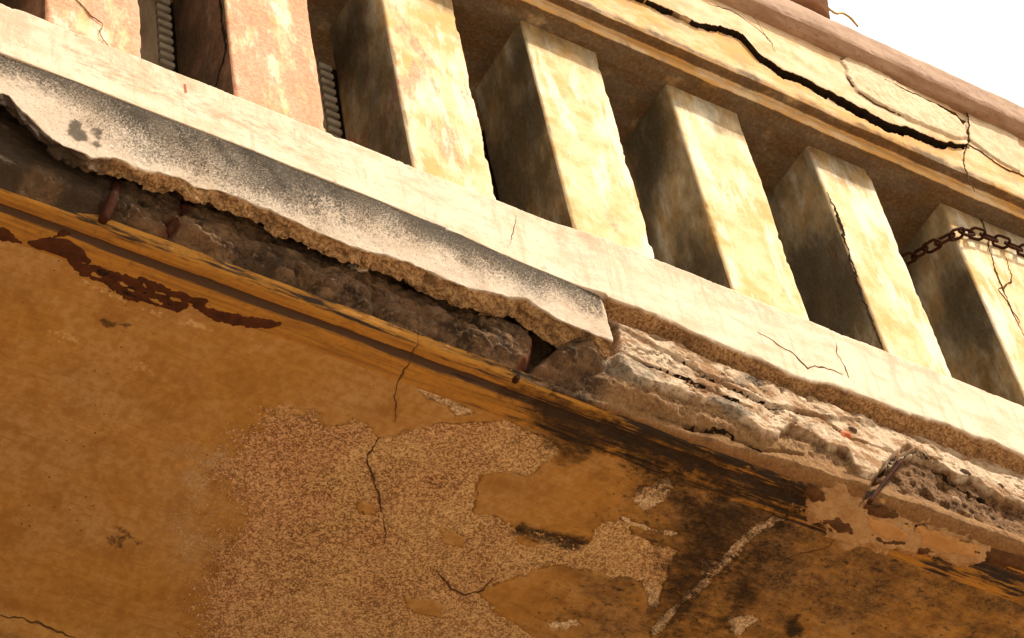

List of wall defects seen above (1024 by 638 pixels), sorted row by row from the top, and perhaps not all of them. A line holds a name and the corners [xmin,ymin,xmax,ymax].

crack [635,0,1024,192]
crack [366,344,418,543]
flaking render [167,388,784,638]
spalling [0,105,1024,558]
damp [502,380,807,637]
crack [758,332,849,378]
crack [980,219,1024,335]